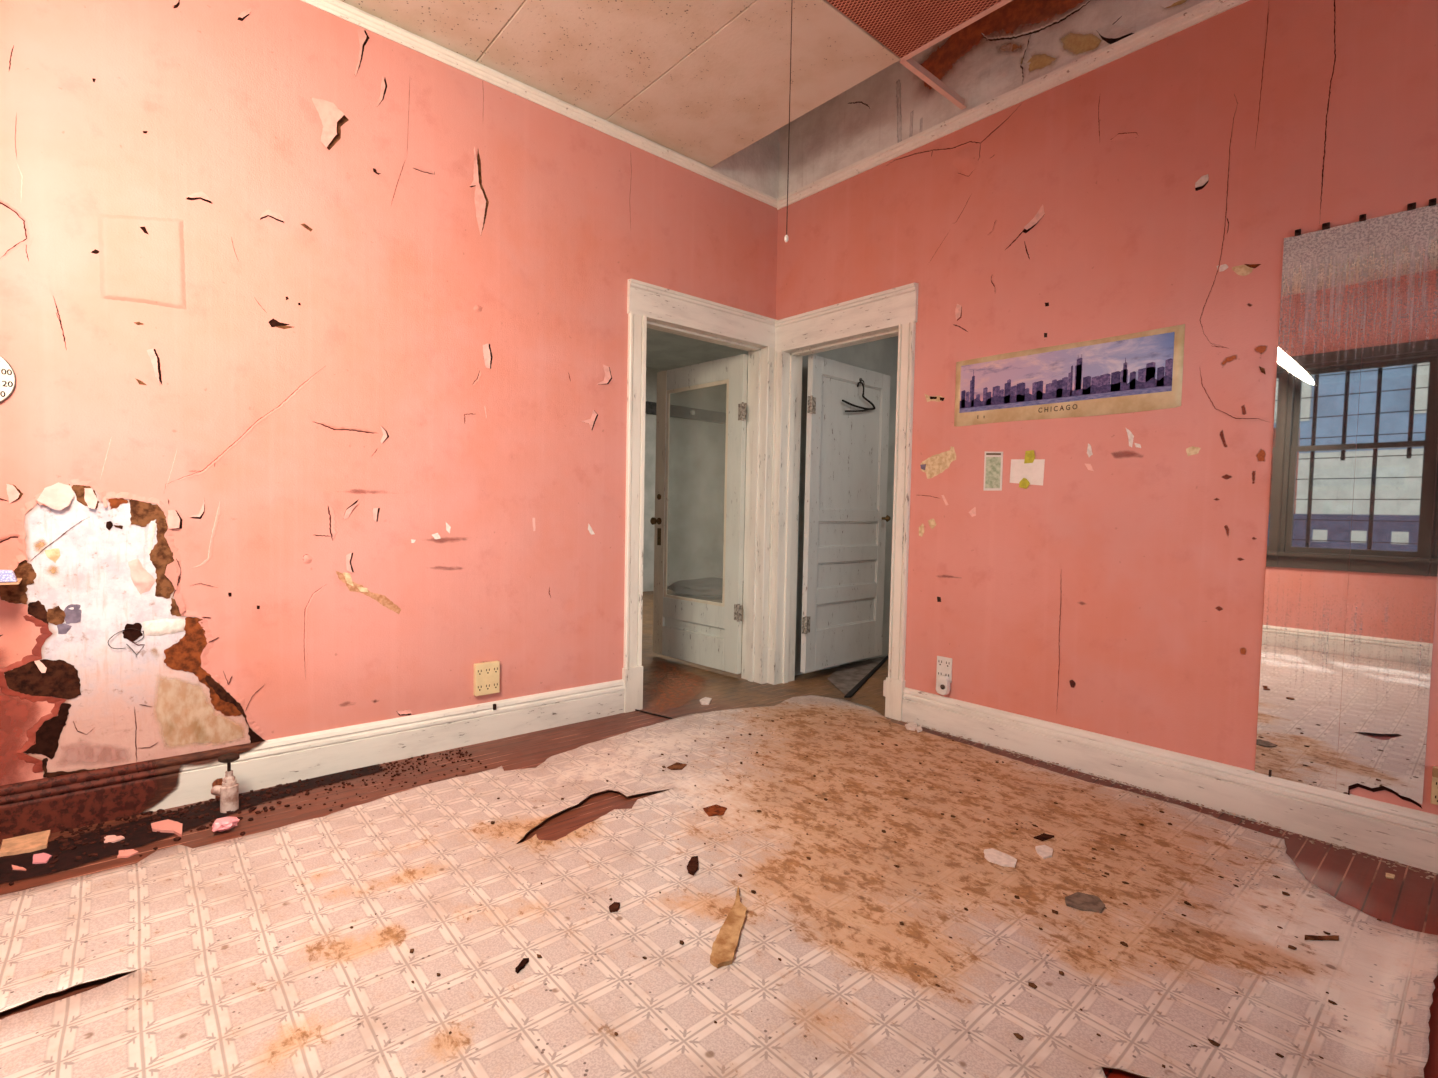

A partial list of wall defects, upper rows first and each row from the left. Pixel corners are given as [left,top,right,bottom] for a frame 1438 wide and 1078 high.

peeling [1096,16,1137,44]
crack [0,113,34,261]
peeling [311,98,349,150]
peeling [470,147,489,236]
peeling [1005,204,1045,259]
crack [1200,7,1269,348]
crack [1319,0,1336,224]
peeling [135,348,162,385]
crack [164,366,378,569]
spalling [0,479,265,778]